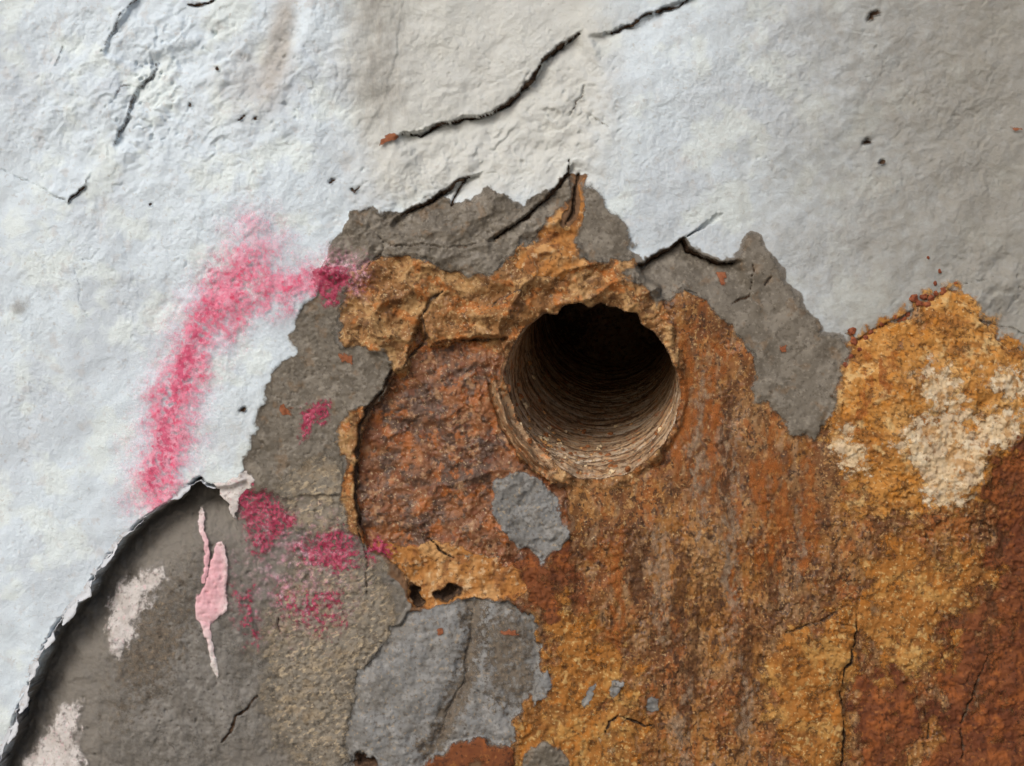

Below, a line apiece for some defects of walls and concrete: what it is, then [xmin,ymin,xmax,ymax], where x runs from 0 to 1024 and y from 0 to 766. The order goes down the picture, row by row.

crack [611,0,687,34]
crack [114,64,157,144]
crack [402,33,580,138]
corrosion [513,177,588,281]
spalling [247,237,683,766]
corrosion [425,281,1024,766]
peeling [0,471,255,766]